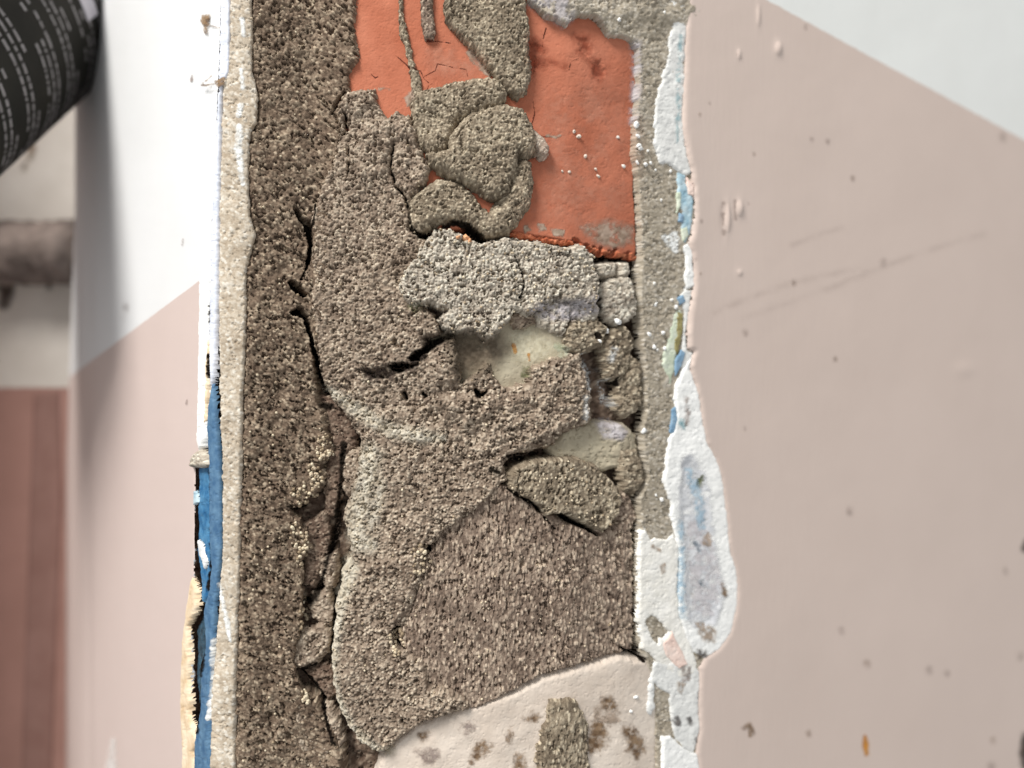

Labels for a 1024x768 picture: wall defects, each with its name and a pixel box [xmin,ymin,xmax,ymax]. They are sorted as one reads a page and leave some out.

crack [288,203,334,410]
crack [390,145,487,243]
crack [593,258,630,312]
peeling [634,1,738,768]
crack [299,441,347,746]
crack [489,451,597,536]